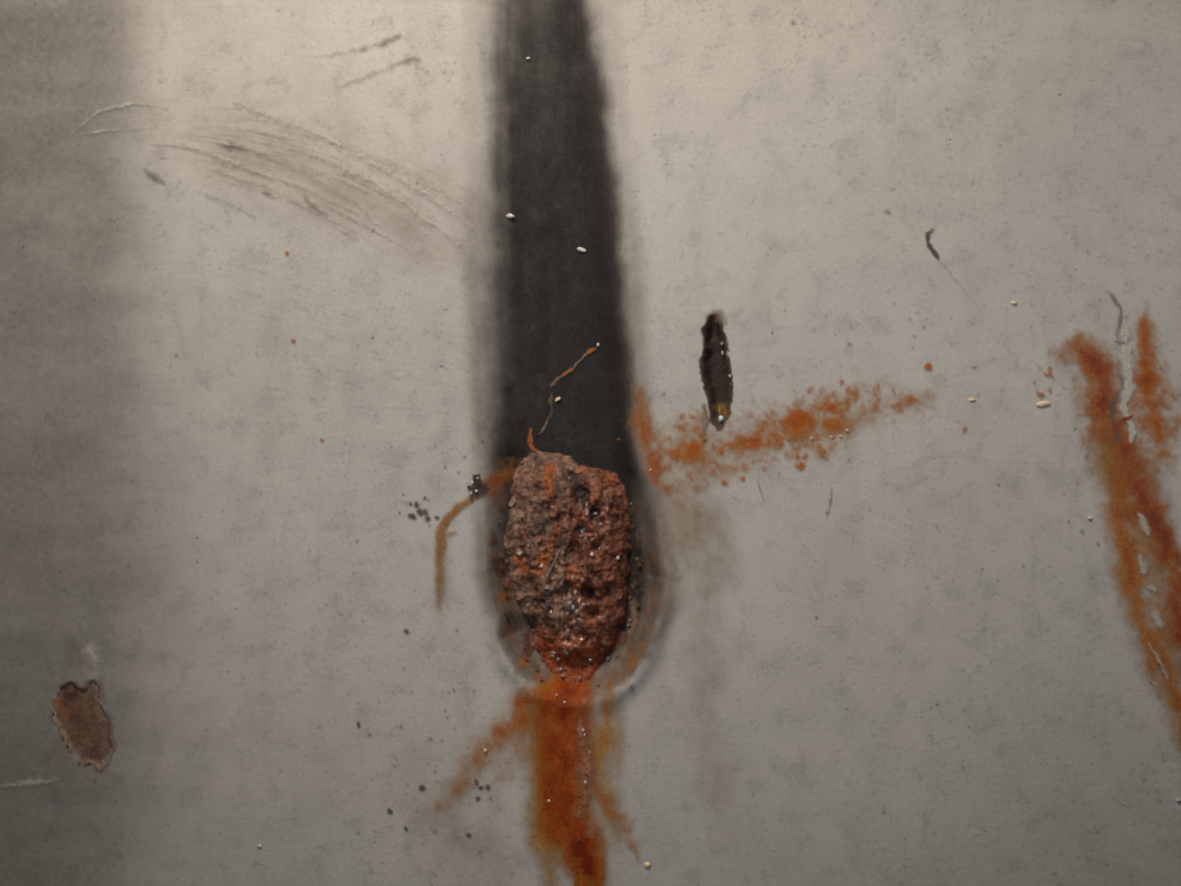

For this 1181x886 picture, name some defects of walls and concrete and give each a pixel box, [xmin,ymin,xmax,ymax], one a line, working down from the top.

rust [436,448,641,886]
damp [480,0,665,699]
rust [632,380,859,493]
rust [1033,316,1181,741]